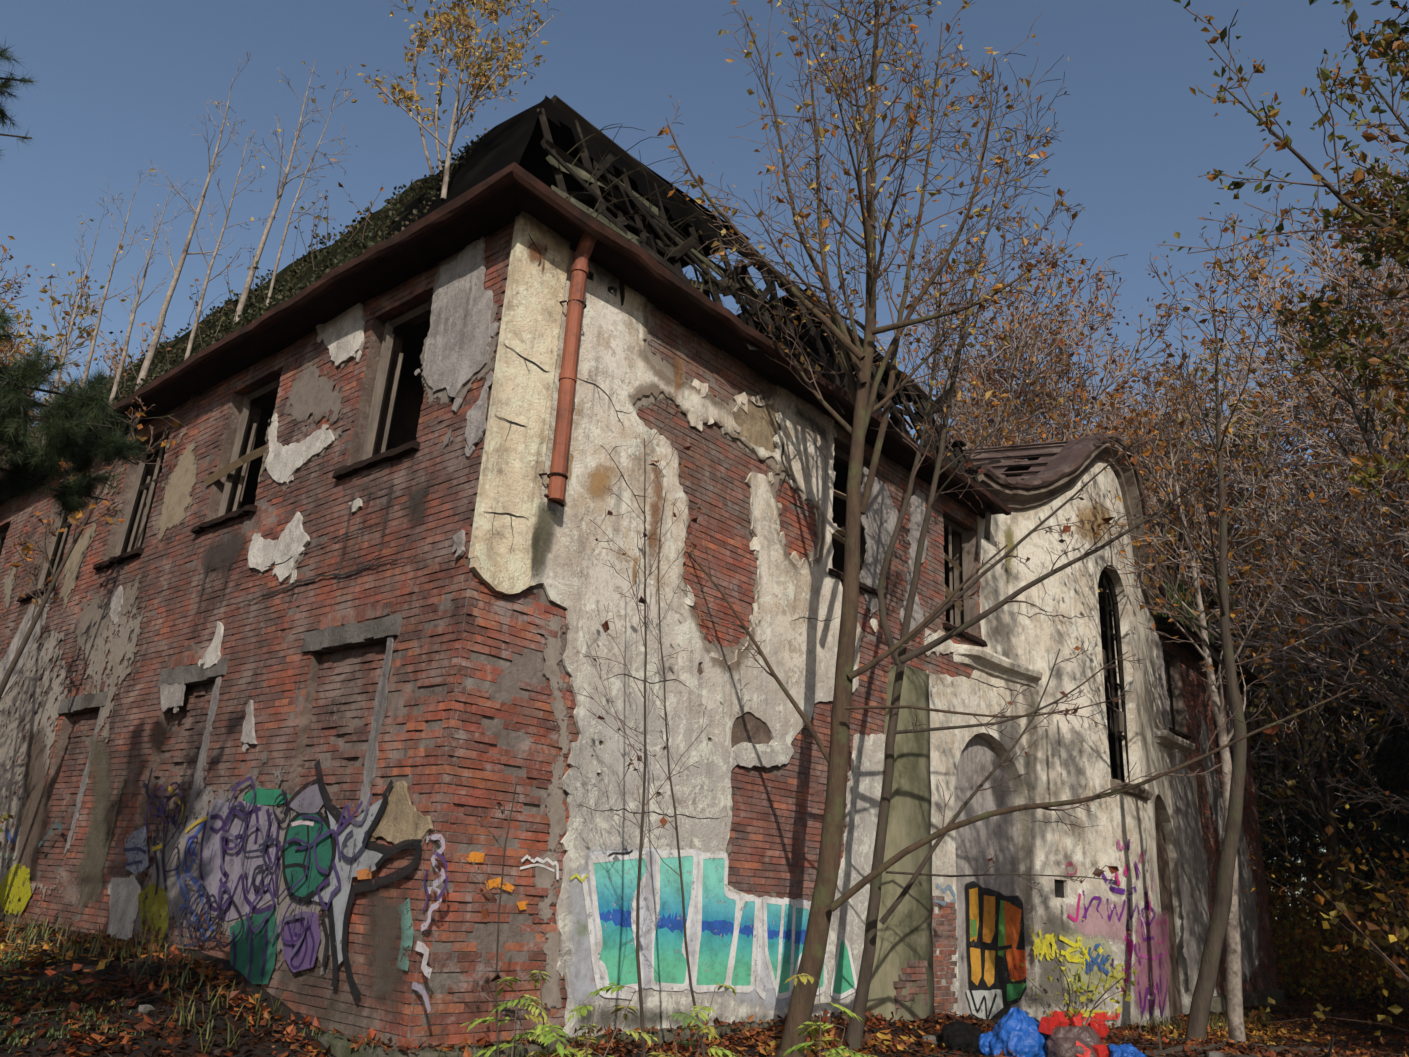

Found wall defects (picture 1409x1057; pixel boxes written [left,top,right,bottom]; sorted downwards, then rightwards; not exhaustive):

flaking render [246,511,310,584]
flaking render [258,303,368,491]
flaking render [348,498,363,513]
flaking render [414,235,499,468]
flaking render [577,272,1100,901]
flaking render [107,700,341,980]
flaking render [356,530,684,1049]
flaking render [893,895,958,1015]